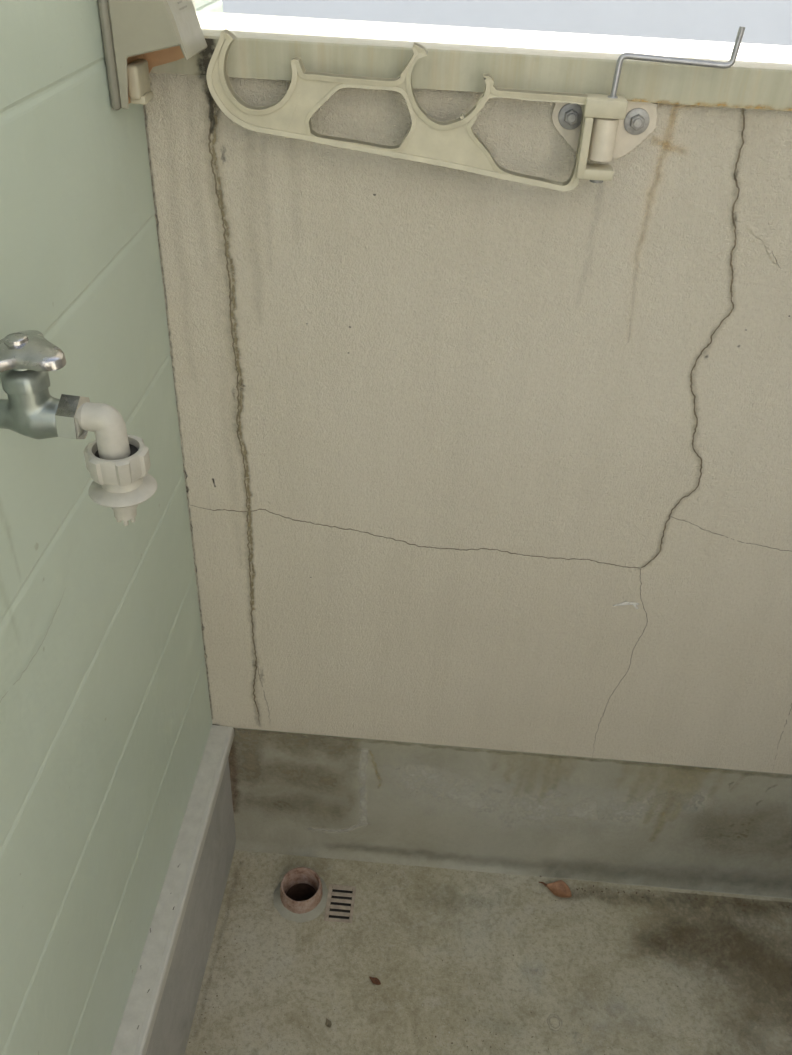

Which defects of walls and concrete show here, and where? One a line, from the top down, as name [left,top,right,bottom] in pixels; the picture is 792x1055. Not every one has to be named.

crack [192,99,792,758]